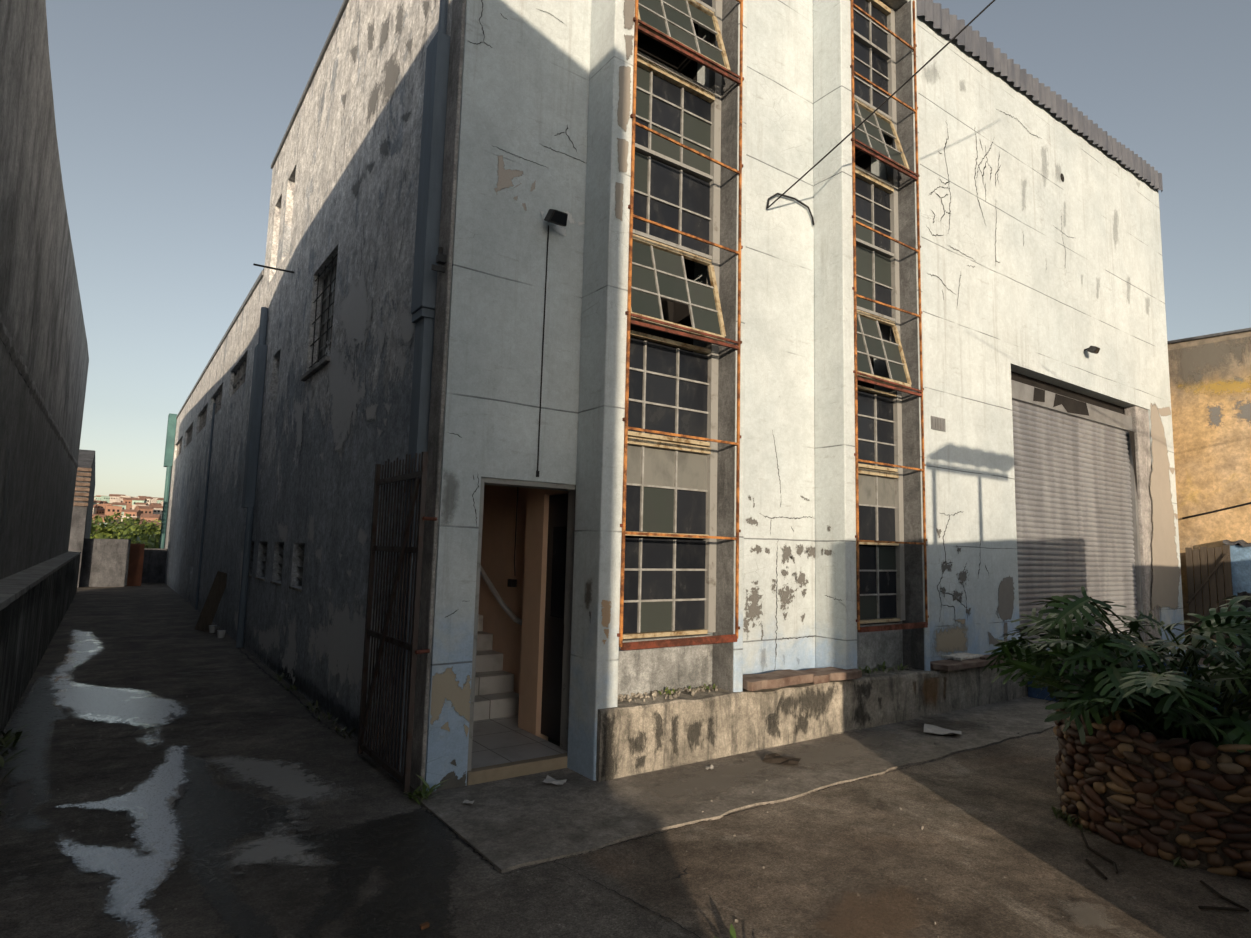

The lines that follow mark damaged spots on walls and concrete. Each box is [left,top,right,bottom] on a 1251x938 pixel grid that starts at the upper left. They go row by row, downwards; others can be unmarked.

spalling [349,4,413,124]
crack [469,0,506,48]
peeling [494,155,585,237]
crack [927,109,1074,310]
peeling [294,335,391,460]
spalling [1178,377,1251,428]
peeling [743,544,835,640]
peeling [940,544,971,616]
peeling [280,587,382,702]
peeling [430,668,471,736]
spalling [436,759,466,791]
damp [601,681,918,801]